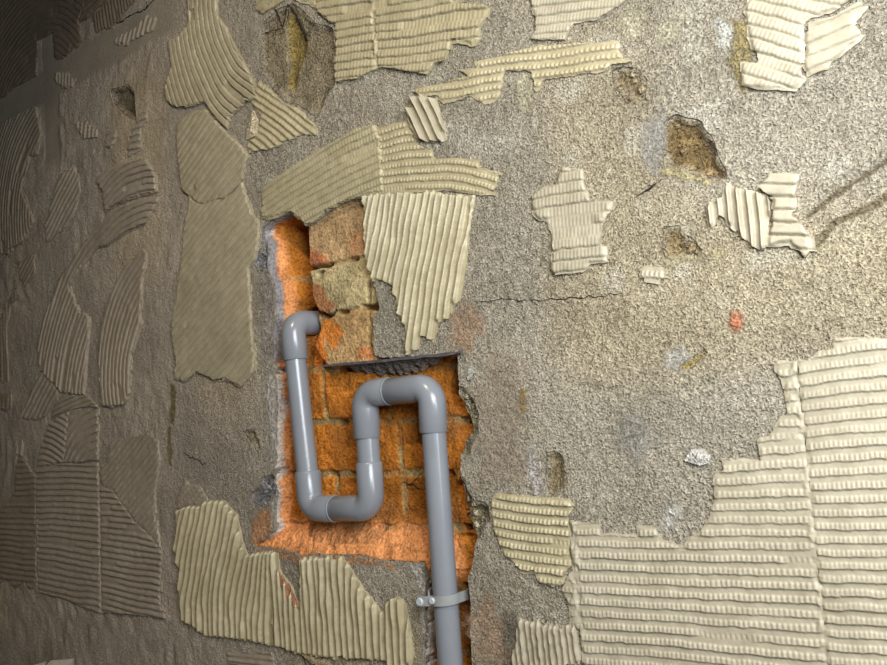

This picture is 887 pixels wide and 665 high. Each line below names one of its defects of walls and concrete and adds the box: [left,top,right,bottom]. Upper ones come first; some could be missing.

spalling [260,3,335,118]
spalling [254,219,275,274]
crack [478,293,621,304]
spalling [459,366,479,460]
spalling [250,474,278,508]
spalling [461,473,490,542]